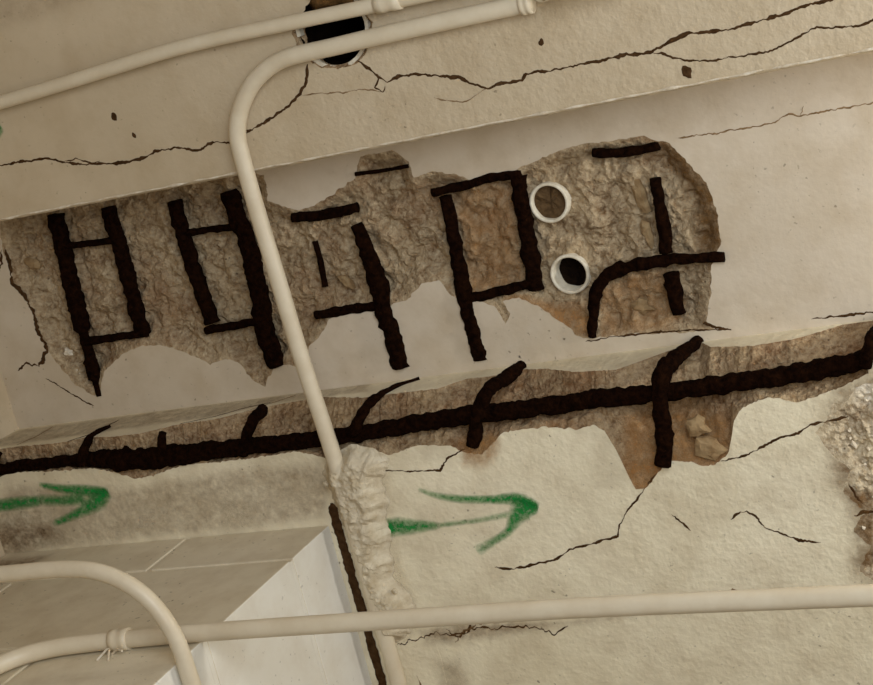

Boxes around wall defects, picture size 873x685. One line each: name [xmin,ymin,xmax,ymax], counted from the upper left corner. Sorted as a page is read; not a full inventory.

crack [0,0,873,166]
corrosion [662,141,721,251]
spalling [0,176,295,397]
corrosion [511,297,588,332]
spalling [255,136,873,580]
spalling [0,400,325,479]
crack [495,474,657,570]
corrosion [627,415,662,489]
crack [731,510,821,543]
crack [722,416,848,461]
crack [848,482,873,516]
crack [328,503,568,685]